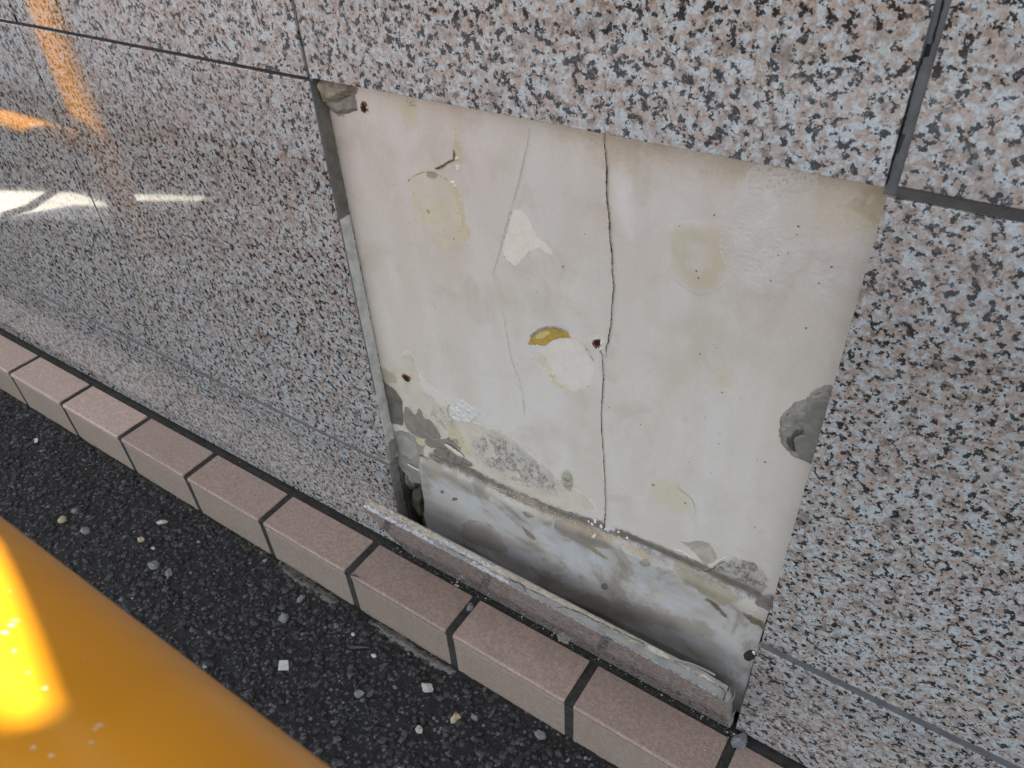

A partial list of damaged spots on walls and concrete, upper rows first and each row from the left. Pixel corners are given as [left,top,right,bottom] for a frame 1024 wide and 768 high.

peeling [501,208,553,267]
spalling [528,326,571,346]
crack [584,144,614,526]
peeling [381,352,628,559]